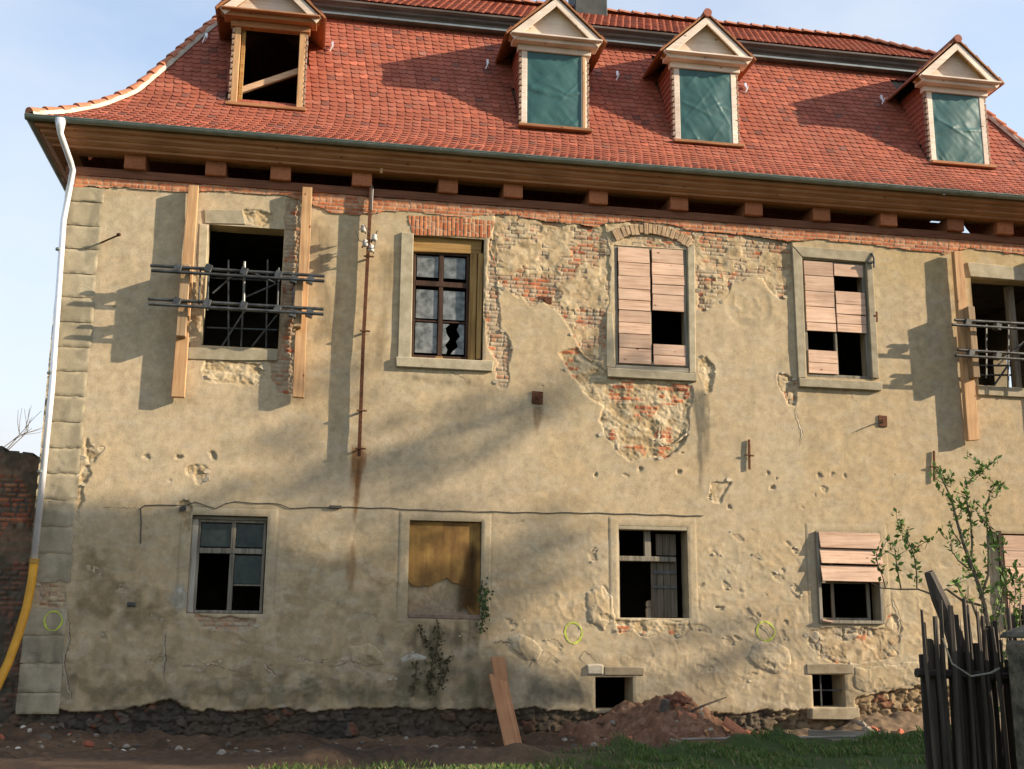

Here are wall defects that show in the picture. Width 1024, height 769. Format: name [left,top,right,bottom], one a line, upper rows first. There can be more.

flaking render [202,199,302,395]
flaking render [484,206,793,478]
flaking render [777,371,797,406]
flaking render [76,439,104,522]
flaking render [175,450,217,485]
rust [352,449,364,511]
flaking render [707,477,732,509]
flaking render [615,618,742,646]